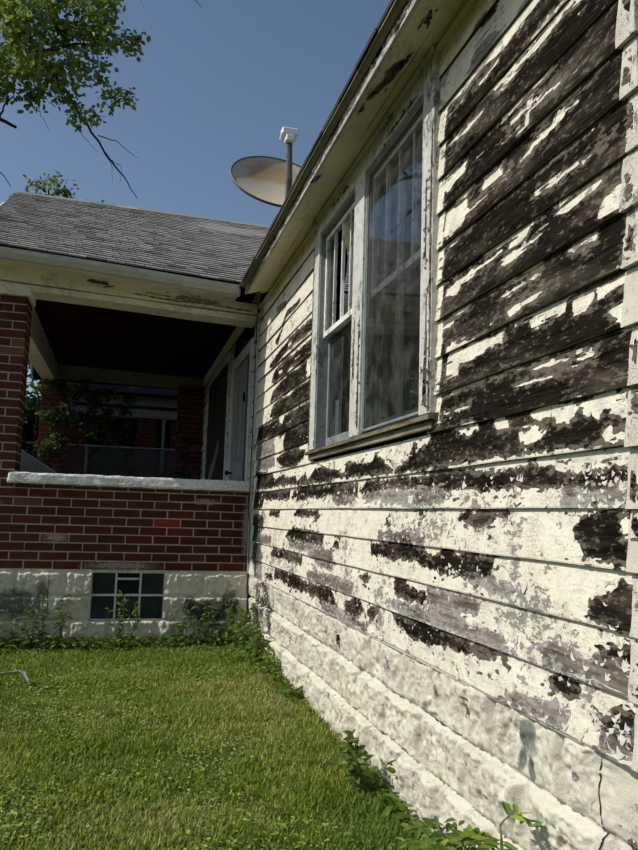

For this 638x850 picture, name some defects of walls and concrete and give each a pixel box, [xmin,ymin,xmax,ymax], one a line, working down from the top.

peeling [245,0,638,764]
crack [590,756,608,850]